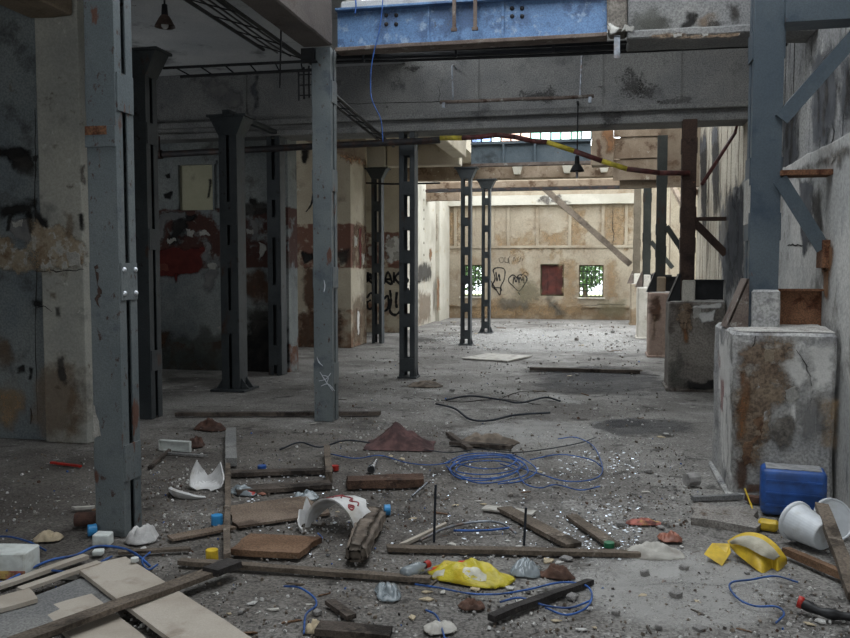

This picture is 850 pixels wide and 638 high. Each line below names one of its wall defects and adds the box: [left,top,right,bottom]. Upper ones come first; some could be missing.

damp [601,112,625,127]
damp [621,67,691,105]
damp [782,114,799,167]
damp [811,56,850,147]
damp [799,181,822,231]
peeling [0,213,87,275]
peeling [159,212,220,292]
peeling [352,223,372,269]
peeling [385,235,399,263]
damp [800,227,811,255]
crack [796,350,814,403]